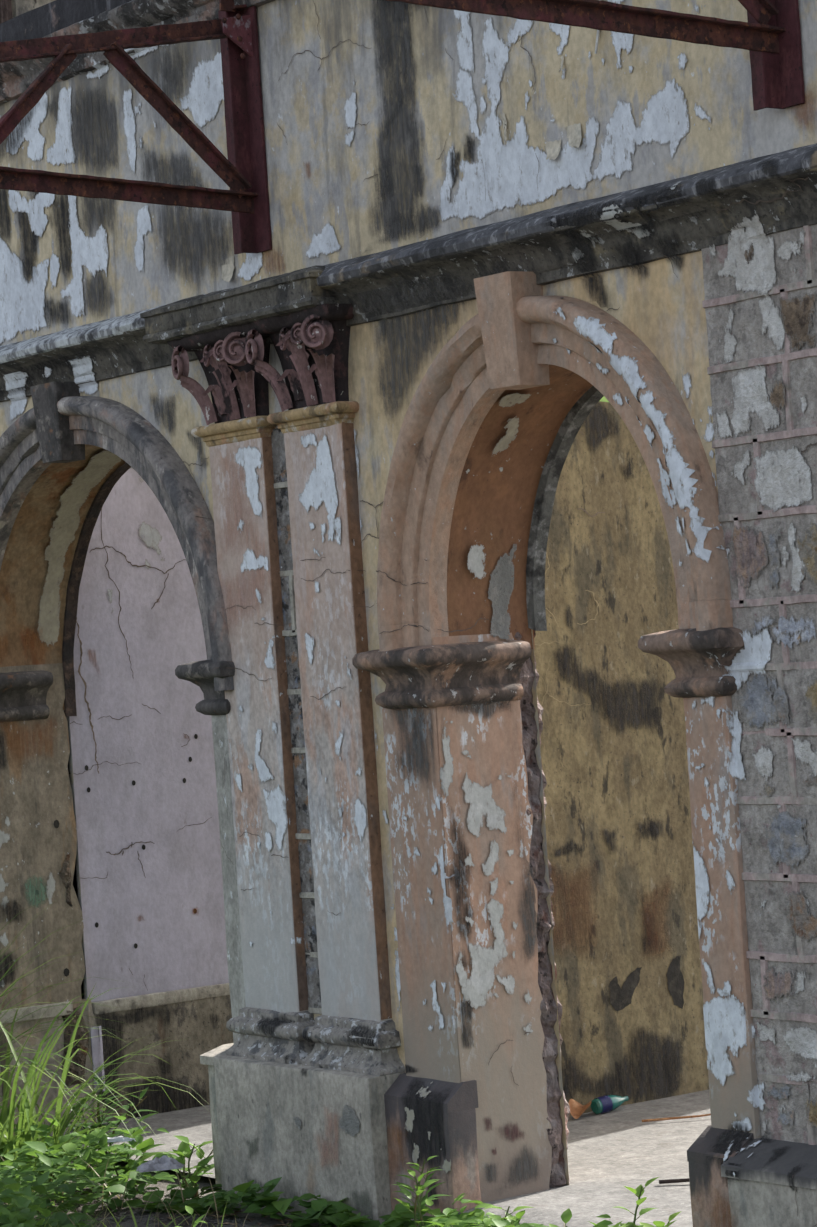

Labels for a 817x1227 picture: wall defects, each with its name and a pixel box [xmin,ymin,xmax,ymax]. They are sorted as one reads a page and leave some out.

peeling [6,59,111,166]
leakage [372,0,438,240]
peeling [439,10,711,222]
peeling [0,190,109,344]
leakage [583,405,618,449]
peeling [553,307,814,567]
crack [69,509,186,775]
leakage [556,646,660,731]
peeling [423,717,532,1034]
leakage [520,868,538,956]
leakage [562,1028,680,1100]
peeling [703,961,817,1086]